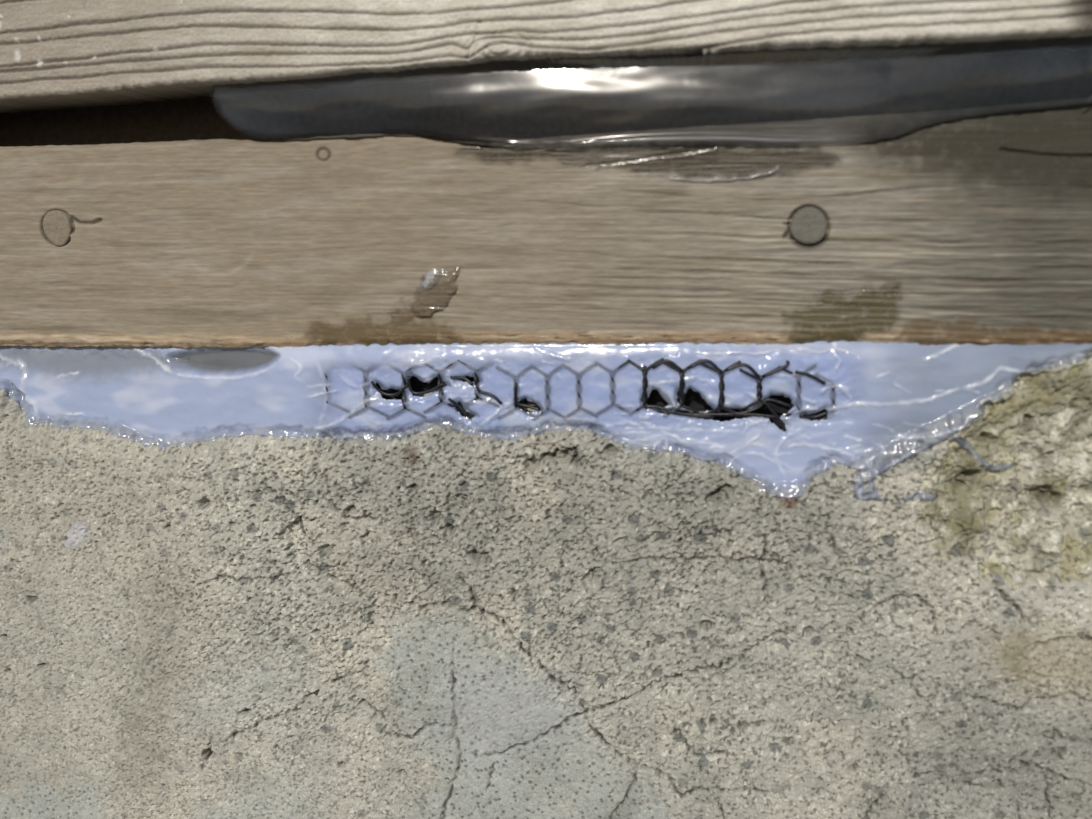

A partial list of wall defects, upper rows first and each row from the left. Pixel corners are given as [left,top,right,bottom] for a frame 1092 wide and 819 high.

crack [633,535,780,603]
spalling [912,350,1092,590]
crack [406,578,766,817]